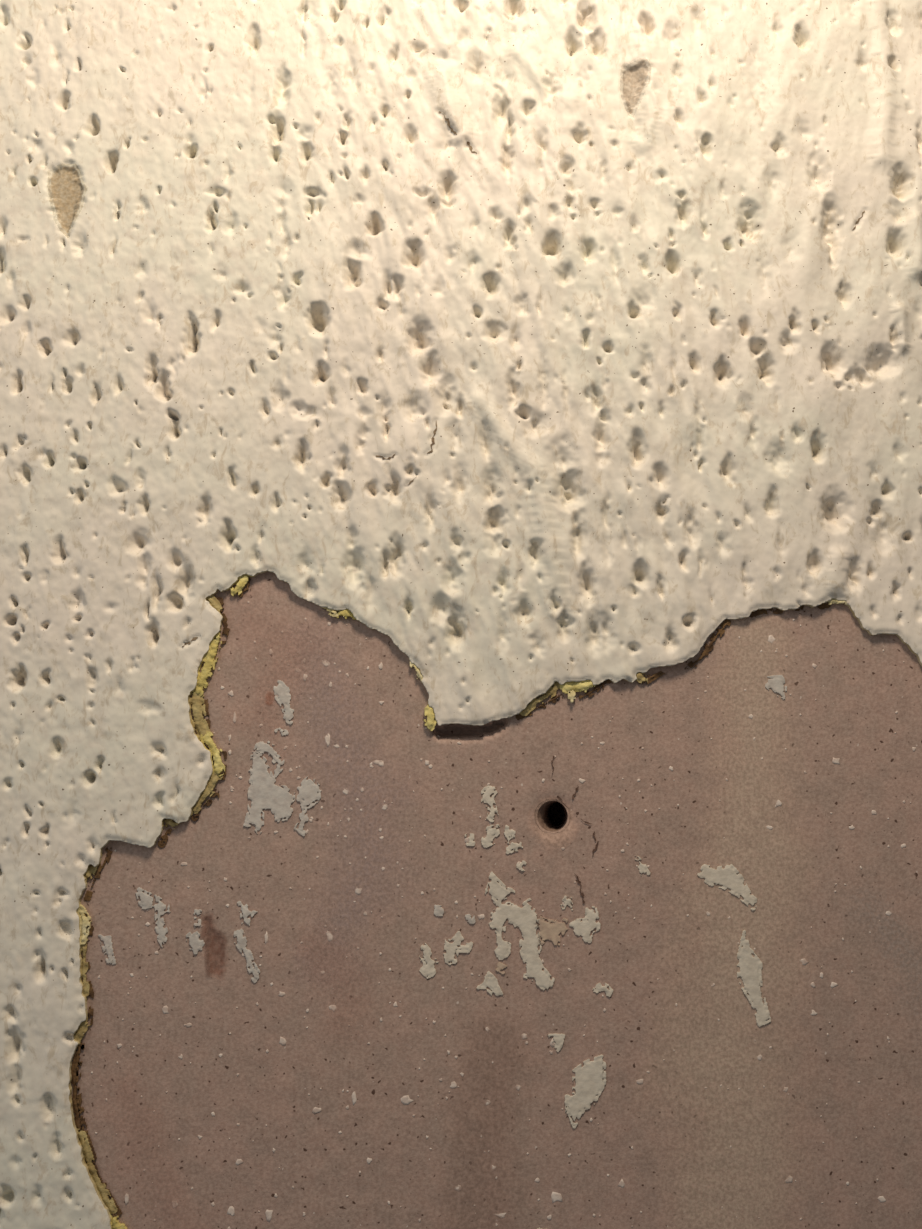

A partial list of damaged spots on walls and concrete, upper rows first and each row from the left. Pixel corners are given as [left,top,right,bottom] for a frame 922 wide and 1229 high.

peeling [71,572,922,1229]